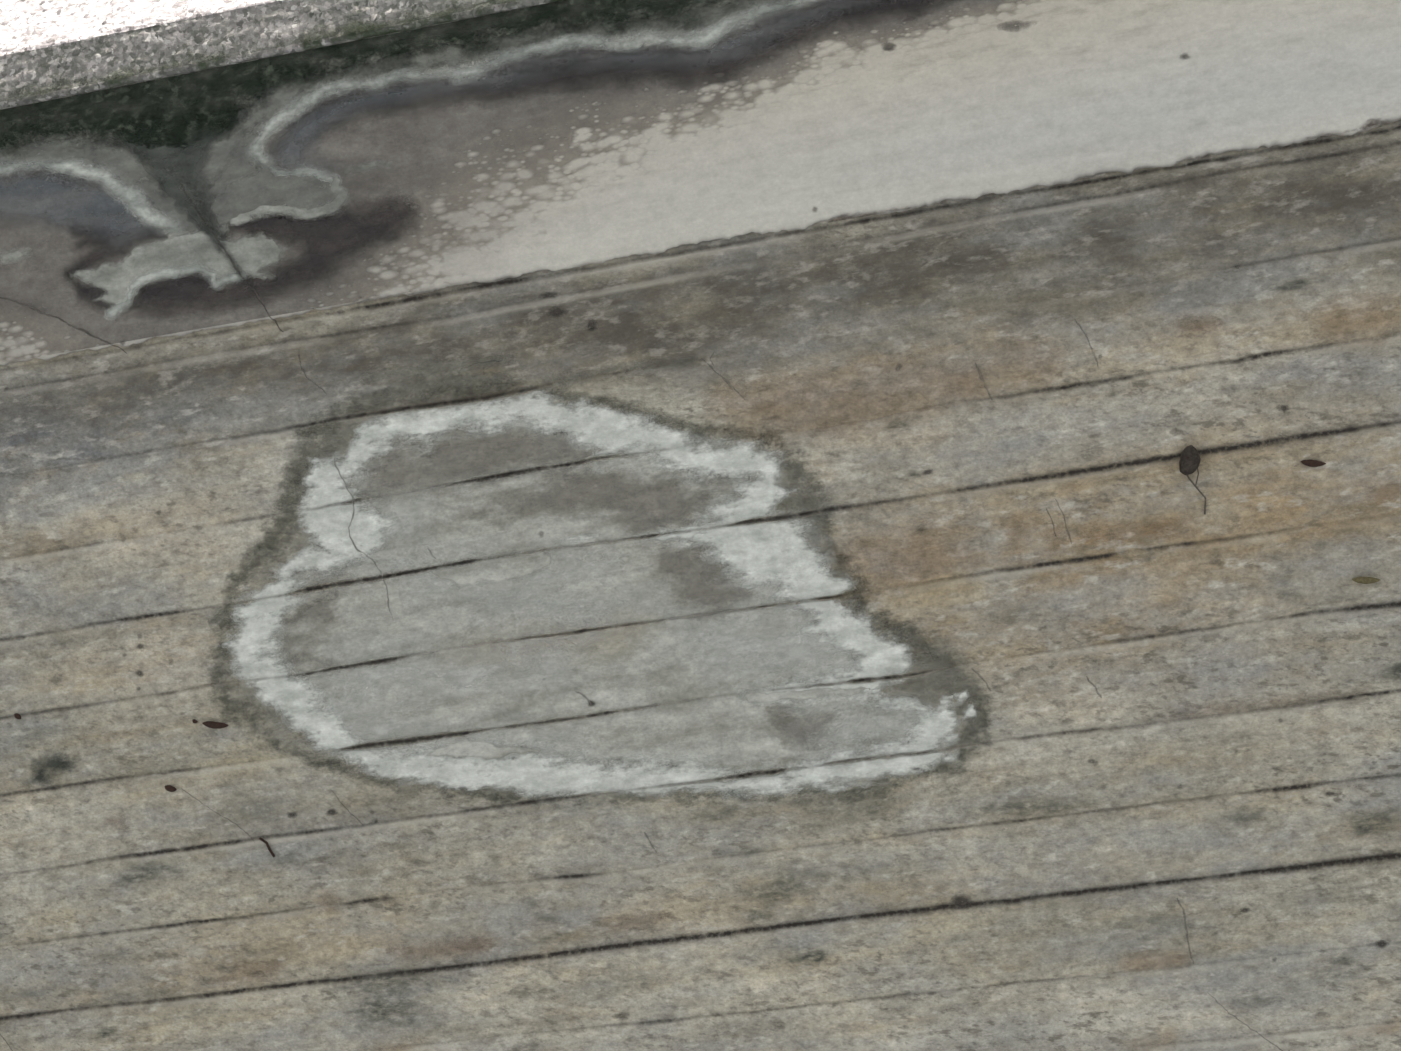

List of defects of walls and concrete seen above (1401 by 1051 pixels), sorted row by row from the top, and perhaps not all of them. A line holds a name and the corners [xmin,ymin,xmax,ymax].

crack [0,297,126,353]
crack [177,180,324,391]
water stain [0,0,1024,360]
crack [334,459,392,615]
water stain [210,357,988,804]